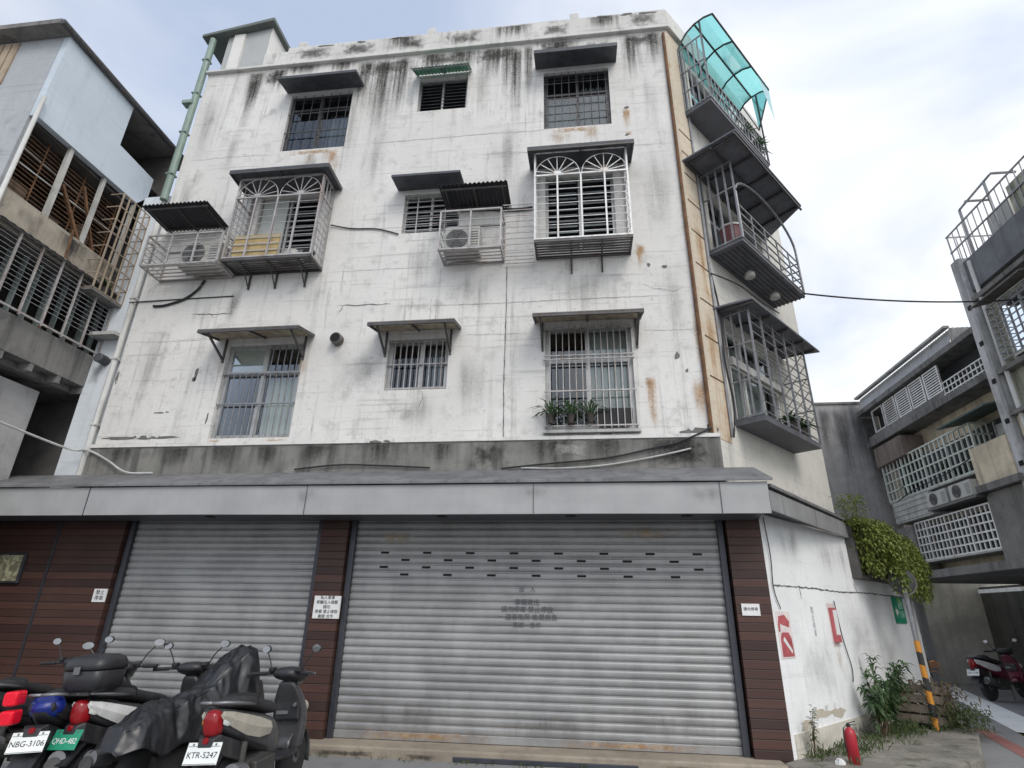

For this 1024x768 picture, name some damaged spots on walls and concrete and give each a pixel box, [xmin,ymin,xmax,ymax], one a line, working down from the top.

water stain [244,50,322,112]
water stain [337,45,408,100]
water stain [426,33,532,85]
water stain [626,34,658,59]
crack [325,235,445,328]
water stain [541,433,610,454]
water stain [663,440,694,460]
peeling [801,702,846,731]